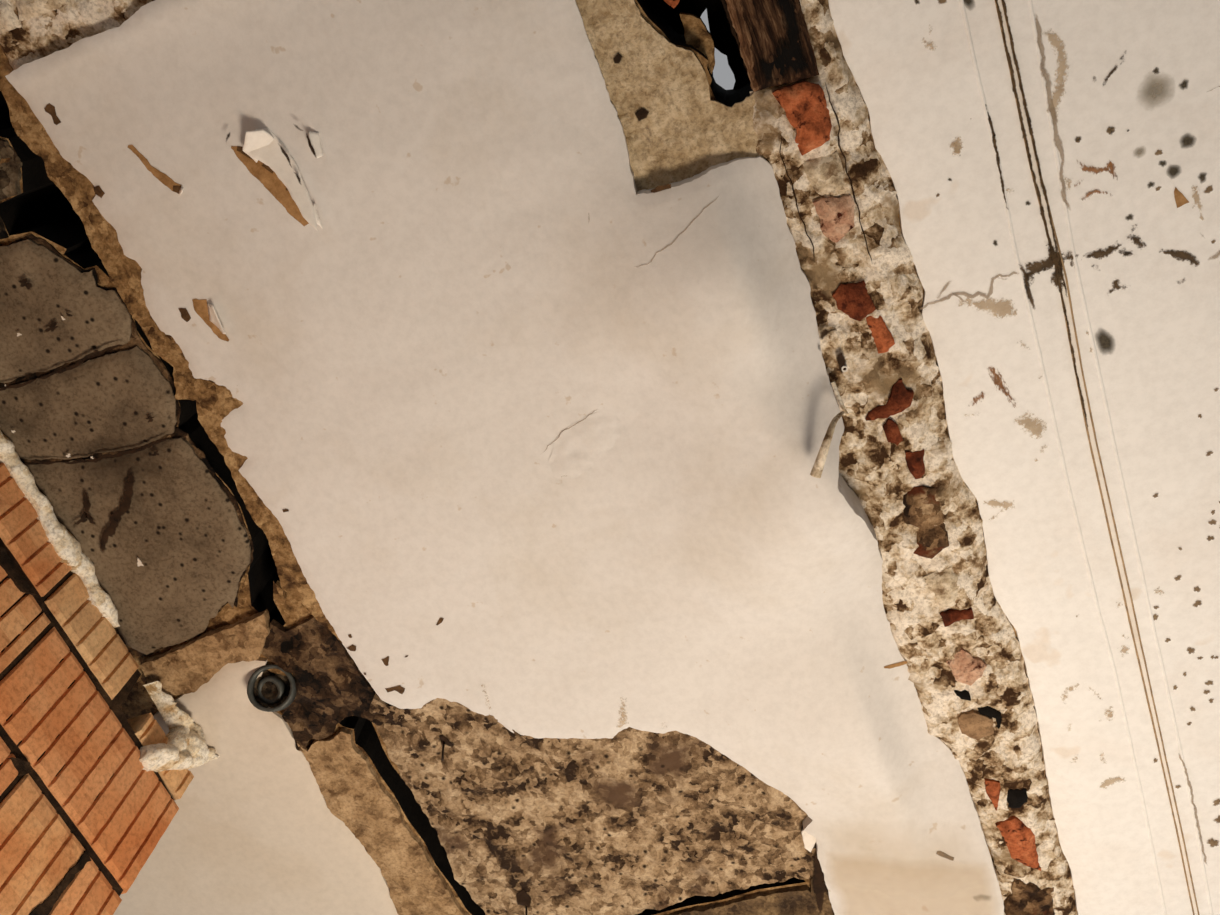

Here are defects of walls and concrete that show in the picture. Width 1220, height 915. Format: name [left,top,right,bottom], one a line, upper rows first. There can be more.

spalling [44,103,61,125]
flaking render [576,0,762,193]
peeling [242,128,324,231]
crack [1074,161,1117,199]
crack [920,229,1220,309]
spalling [178,308,191,322]
spalling [370,685,829,915]